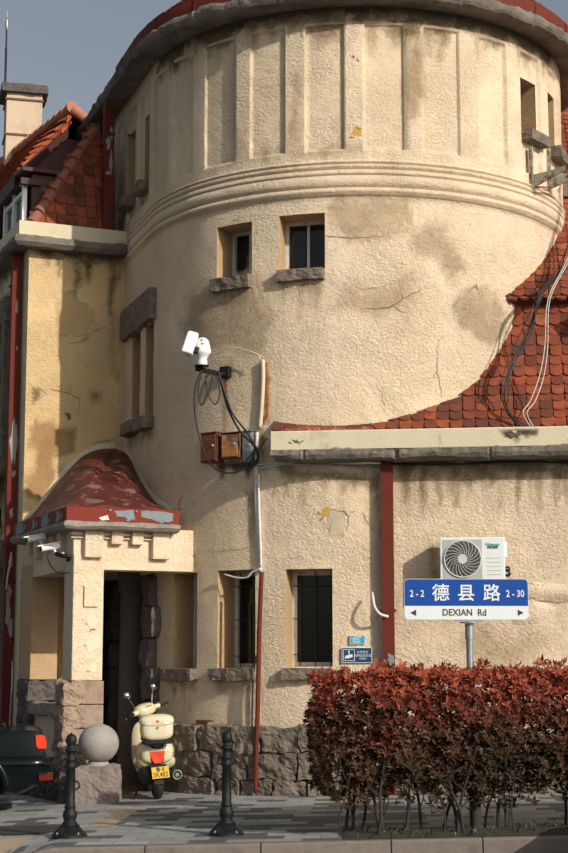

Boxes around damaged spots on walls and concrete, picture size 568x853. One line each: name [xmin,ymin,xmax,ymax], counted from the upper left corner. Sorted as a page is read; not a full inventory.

damp [157,6,551,73]
damp [40,250,119,289]
crack [357,284,421,312]
peeling [9,417,18,477]
damp [398,461,456,475]
damp [466,460,568,483]
peeling [99,509,173,523]